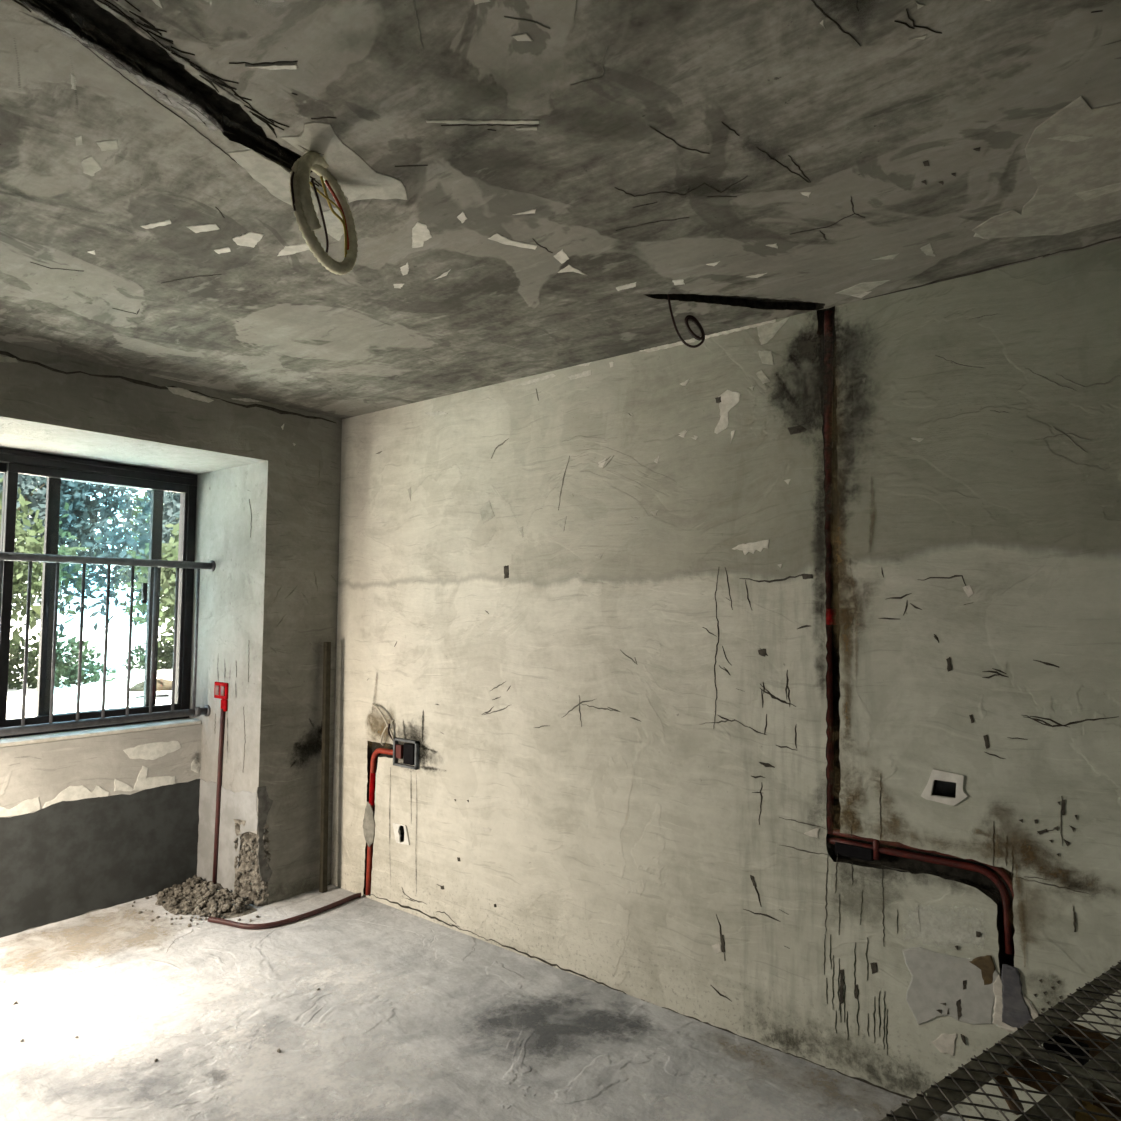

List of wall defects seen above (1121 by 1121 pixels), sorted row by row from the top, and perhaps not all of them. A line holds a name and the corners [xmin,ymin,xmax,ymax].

leakage [894,9,942,34]
crack [23,0,242,167]
crack [229,61,298,95]
crack [0,351,336,423]
leakage [771,331,833,431]
peeling [0,741,181,817]
leakage [397,711,435,770]
crack [703,568,913,942]
crack [969,715,1119,759]
spalling [232,819,271,907]
leakage [824,894,888,1050]
leakage [479,997,650,1056]